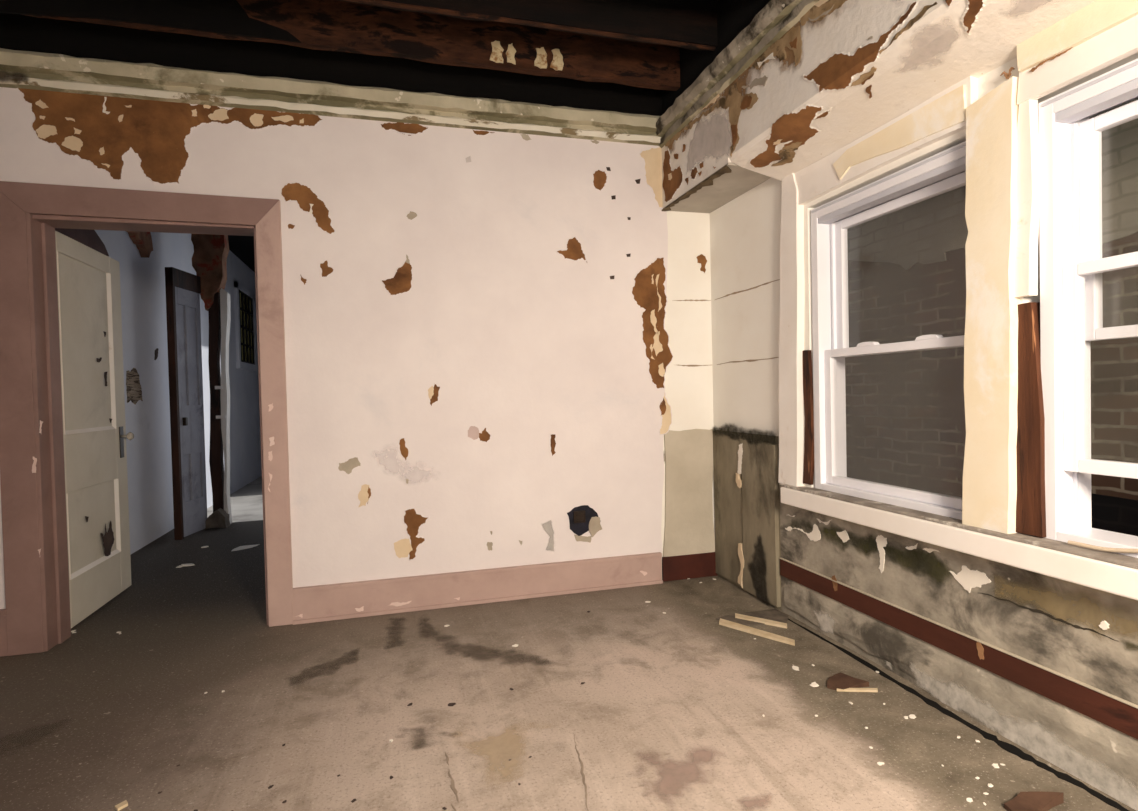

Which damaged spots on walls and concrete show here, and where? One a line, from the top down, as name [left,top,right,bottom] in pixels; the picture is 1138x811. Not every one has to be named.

peeling [16,88,324,185]
peeling [635,0,952,209]
peeling [280,182,336,235]
peeling [380,255,414,296]
peeling [630,257,673,435]
damp [713,424,776,444]
peeling [394,507,430,561]
damp [749,536,769,606]
damp [791,523,950,582]
damp [815,613,834,633]
damp [994,577,1138,649]
damp [911,667,1138,811]